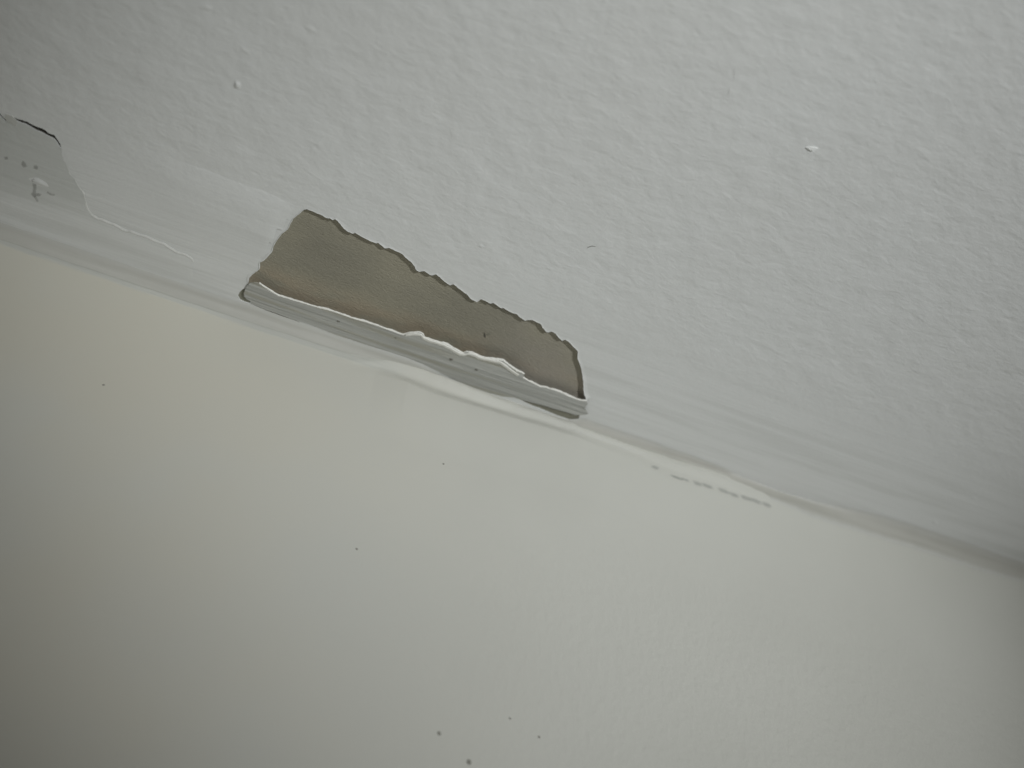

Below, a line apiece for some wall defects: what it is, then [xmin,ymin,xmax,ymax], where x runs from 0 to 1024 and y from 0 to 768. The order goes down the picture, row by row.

peeling [238,207,590,419]